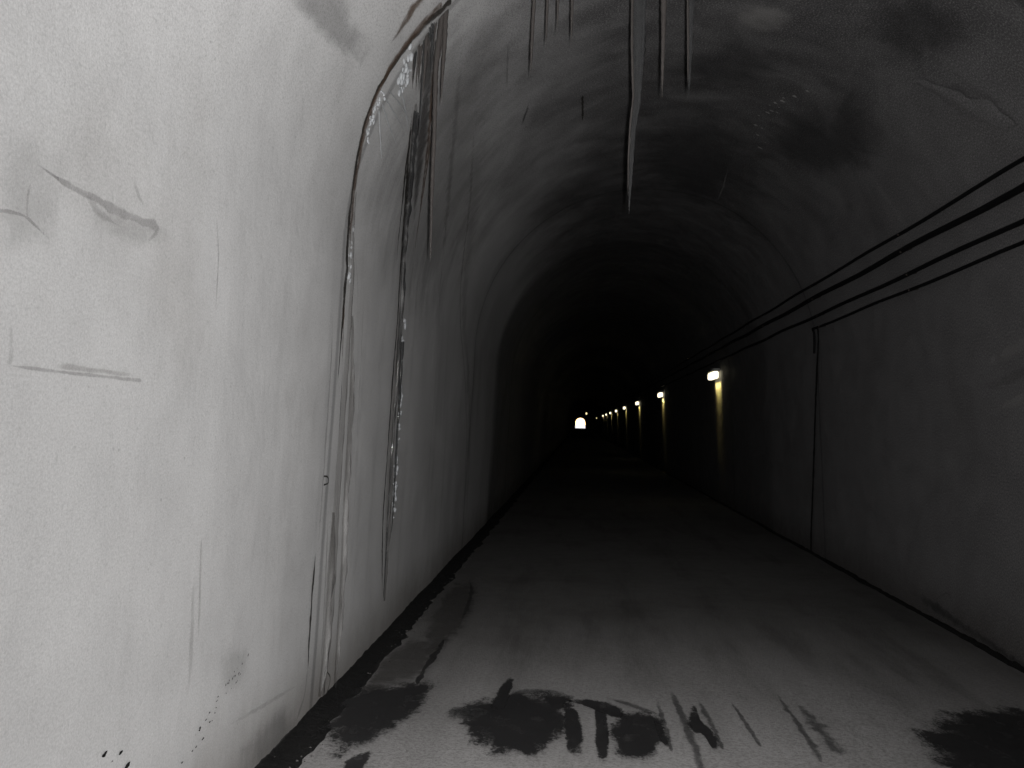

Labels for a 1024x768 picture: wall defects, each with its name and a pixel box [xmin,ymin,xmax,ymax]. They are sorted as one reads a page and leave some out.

leakage [382,46,435,574]
leakage [450,678,668,759]
leakage [912,705,1024,768]